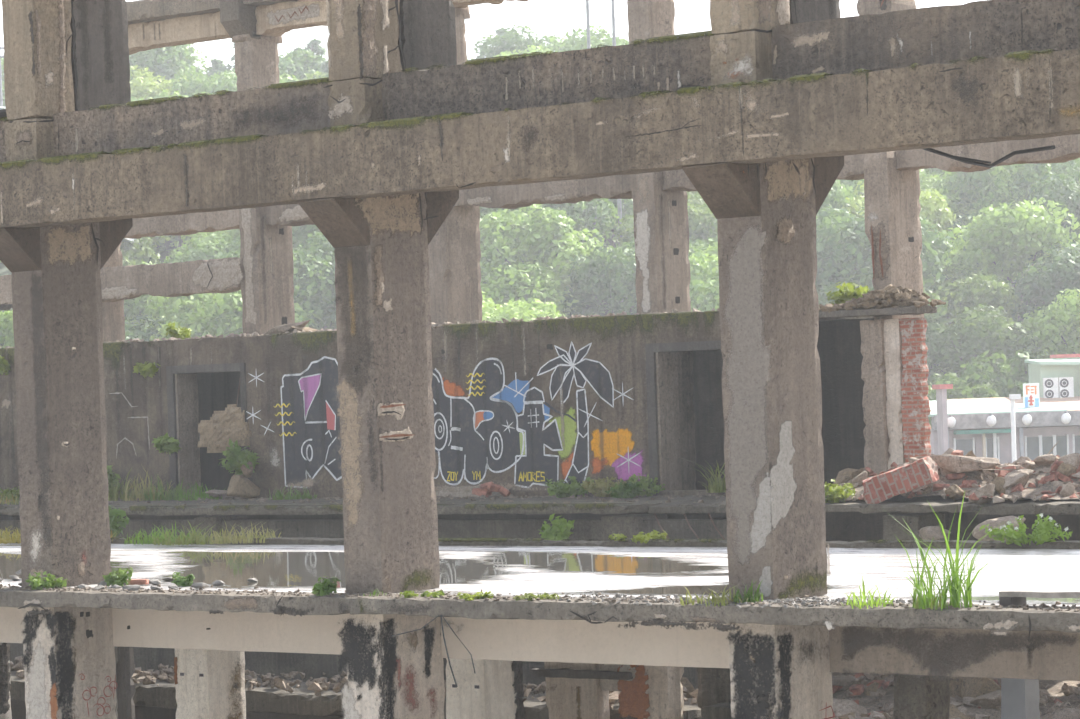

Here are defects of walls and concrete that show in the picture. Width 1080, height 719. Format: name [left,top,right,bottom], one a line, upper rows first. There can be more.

crack [9,0,78,150]
peeling [724,227,797,565]
peeling [759,566,773,597]
water stain [26,612,76,719]
water stain [342,685,362,719]
water stain [376,605,430,719]